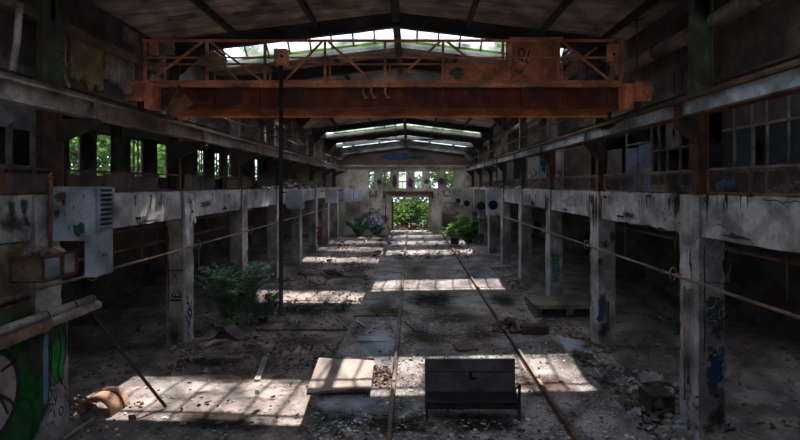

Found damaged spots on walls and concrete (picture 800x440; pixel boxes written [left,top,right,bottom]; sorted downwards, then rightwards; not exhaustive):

damp [0,199,32,232]
damp [664,188,685,224]